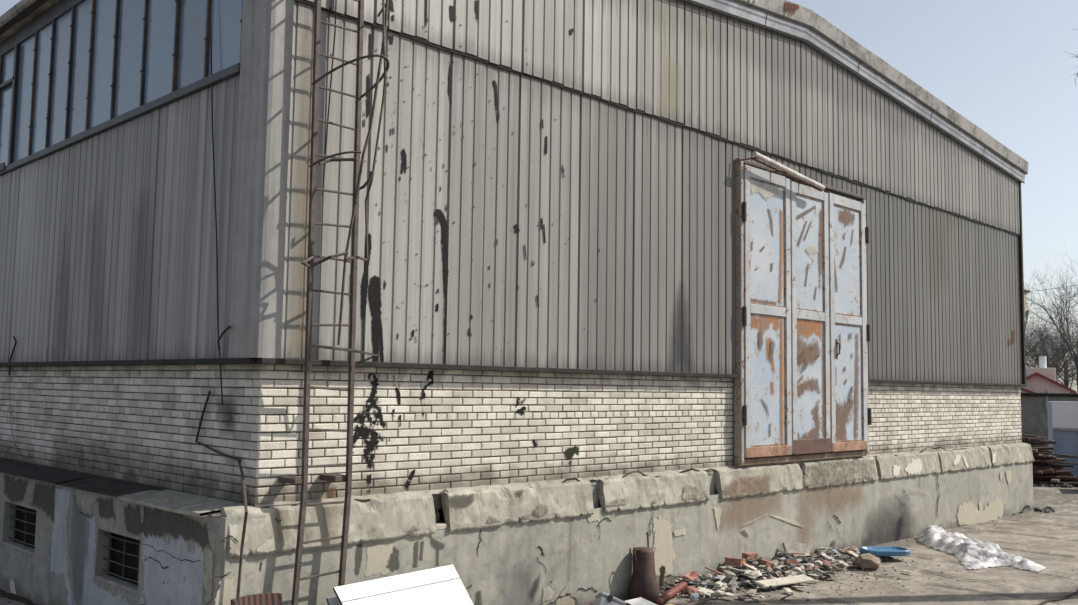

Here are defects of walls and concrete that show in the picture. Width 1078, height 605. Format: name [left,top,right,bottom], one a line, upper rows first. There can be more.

corrosion [785,2,799,15]
corrosion [839,209,855,226]
corrosion [751,209,785,445]
corrosion [797,319,859,446]
spalling [725,475,770,496]
peeling [4,475,236,605]
water stain [142,507,210,548]
crack [140,506,239,578]
peeling [588,498,627,522]
peeling [957,498,1004,526]